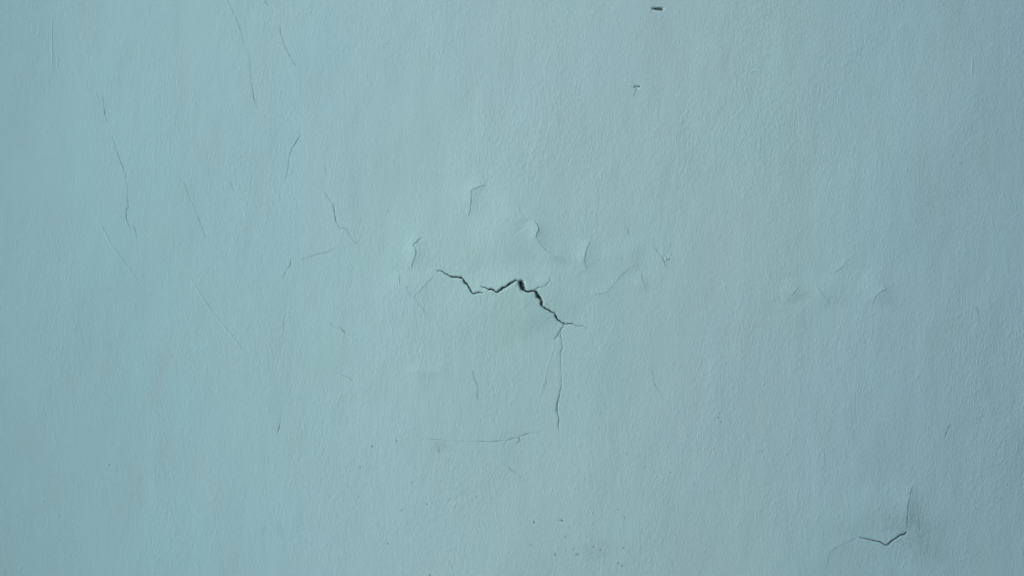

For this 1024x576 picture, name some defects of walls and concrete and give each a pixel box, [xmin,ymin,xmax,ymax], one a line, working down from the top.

crack [442,271,586,356]